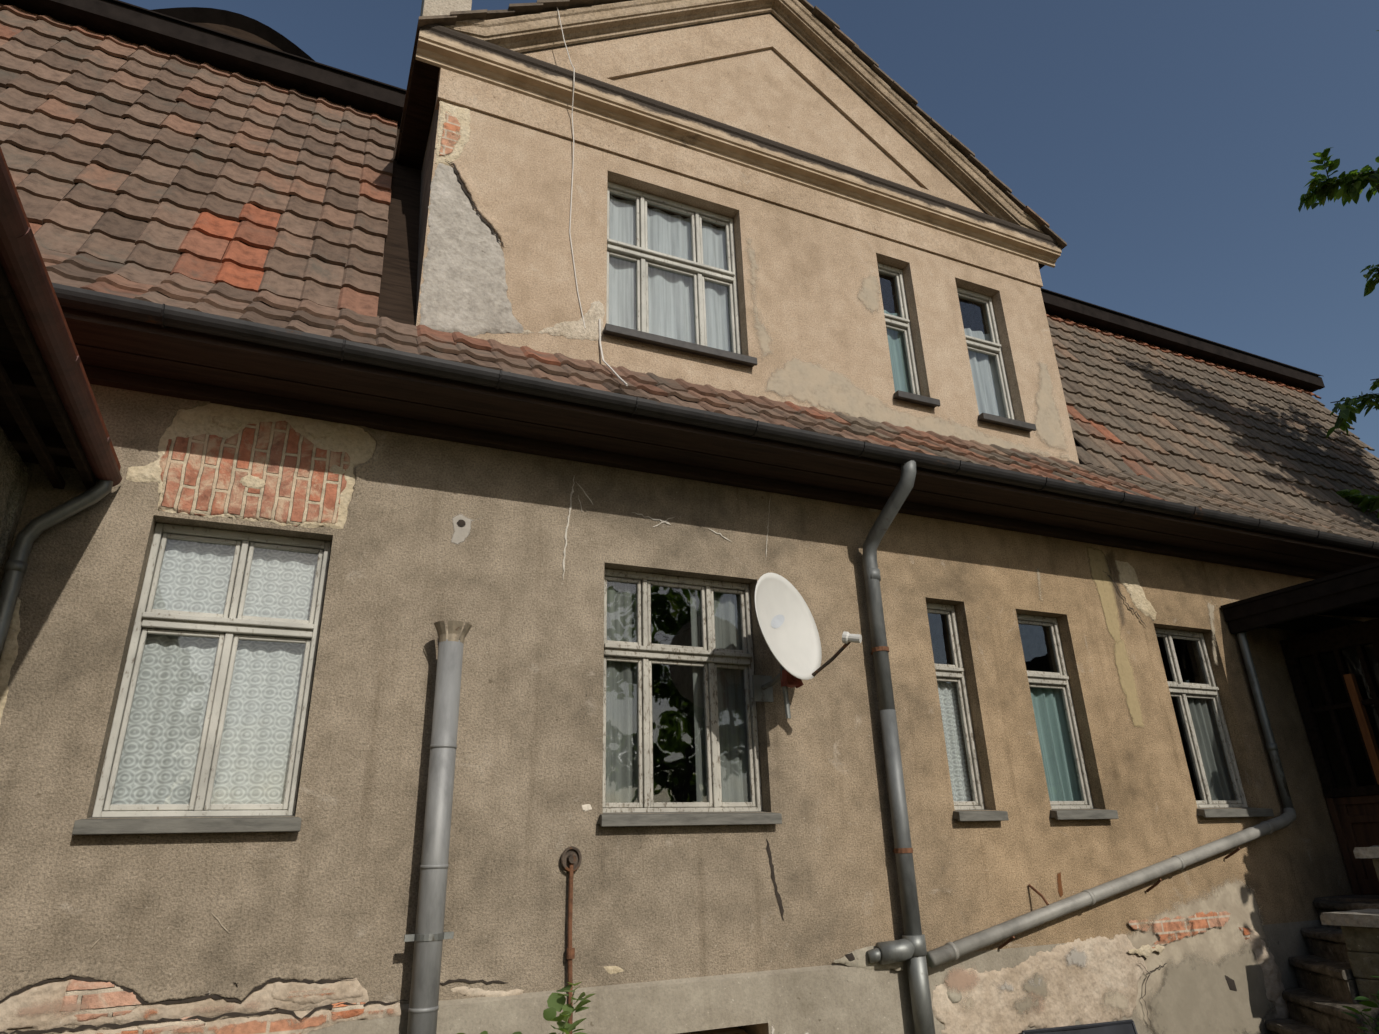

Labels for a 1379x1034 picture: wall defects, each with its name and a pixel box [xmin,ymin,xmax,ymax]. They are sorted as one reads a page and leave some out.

spalling [419,101,605,341]
spalling [126,400,386,529]
spalling [0,959,407,1034]
spalling [932,881,1268,1034]